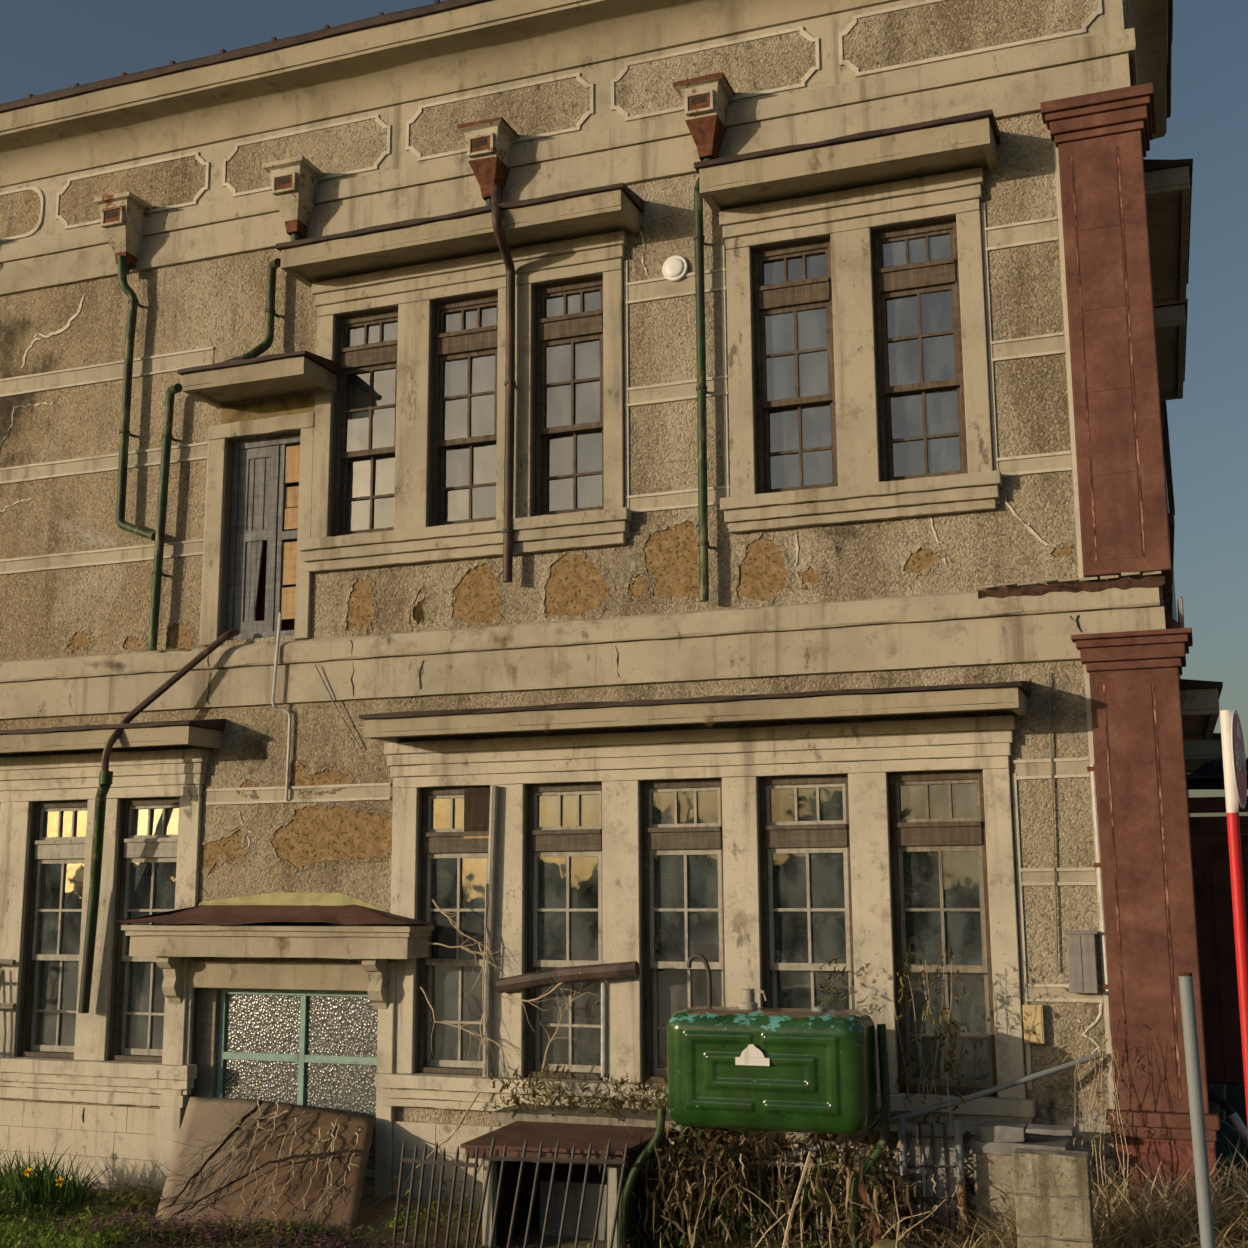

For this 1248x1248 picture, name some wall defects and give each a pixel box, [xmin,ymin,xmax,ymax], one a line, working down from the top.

crack [21,296,85,369]
crack [0,401,59,448]
crack [0,498,32,513]
flaking render [341,570,382,637]
flaking render [403,557,509,632]
flaking render [536,512,706,622]
flaking render [730,531,832,607]
flaking render [898,543,948,581]
flaking render [199,823,252,878]
flaking render [233,772,261,800]
flaking render [264,760,393,875]